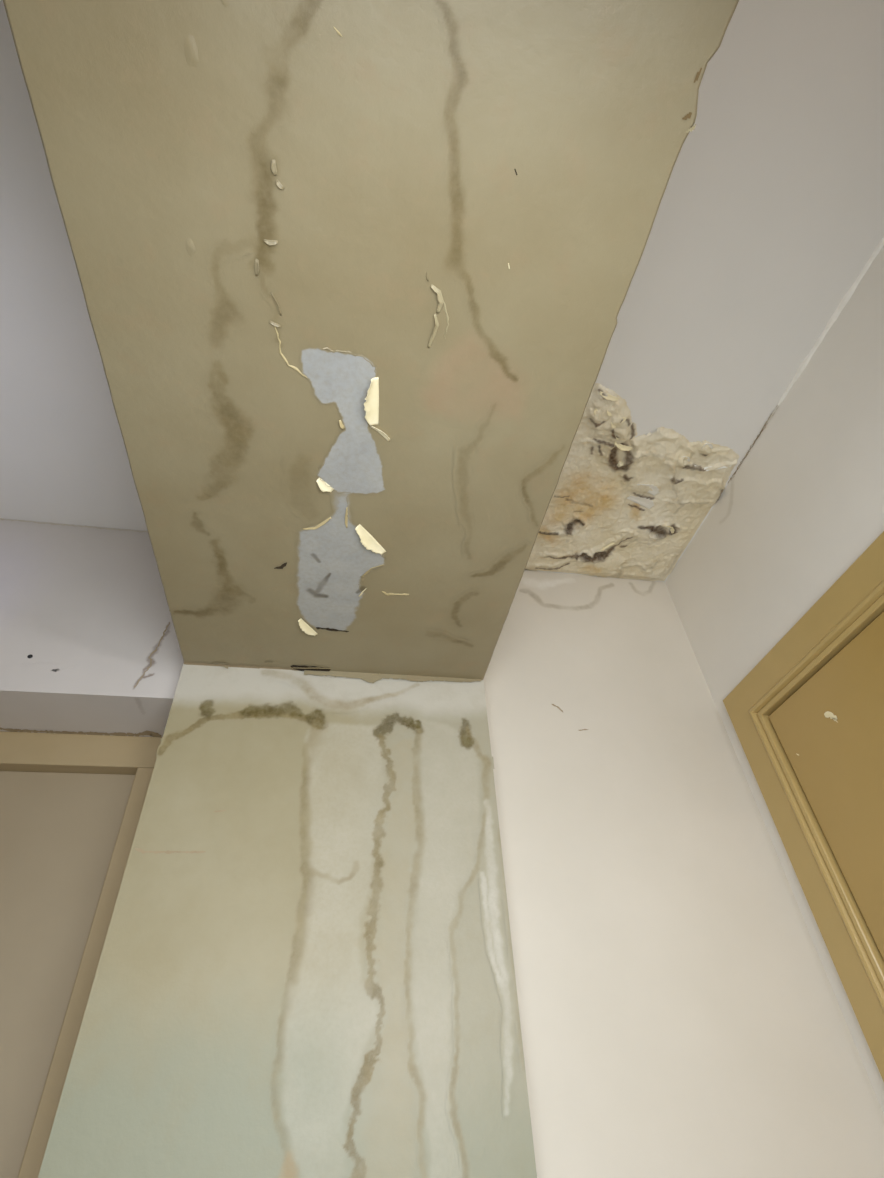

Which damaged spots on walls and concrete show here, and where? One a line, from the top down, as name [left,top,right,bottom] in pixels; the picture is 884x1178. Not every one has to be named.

water stain [169,0,331,621]
peeling [426,272,449,348]
peeling [274,326,390,636]
water stain [517,574,657,612]
peeling [525,383,739,581]
water stain [156,668,525,1178]